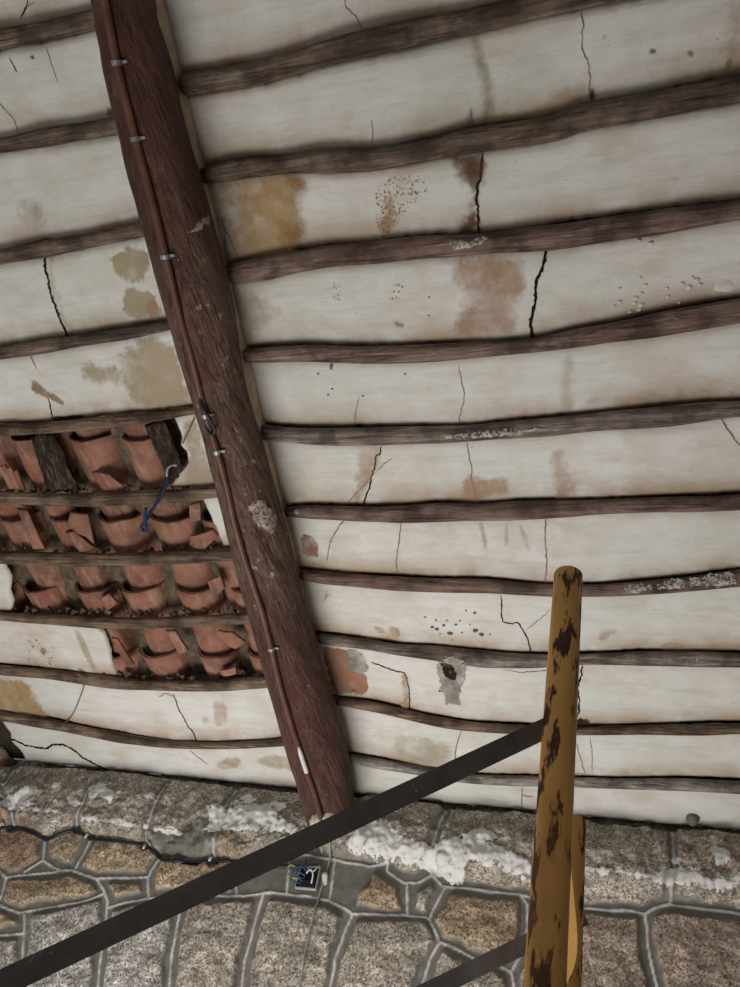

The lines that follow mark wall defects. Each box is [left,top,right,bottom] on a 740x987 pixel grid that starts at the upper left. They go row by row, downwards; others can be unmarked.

water stain [229,175,303,257]
corrosion [373,176,427,238]
crack [475,153,484,233]
crack [43,258,67,336]
water stain [112,247,161,321]
crack [529,251,547,338]
water stain [85,338,188,408]
water stain [0,680,46,717]
spalling [324,646,368,695]
spalling [437,656,466,705]
crack [500,596,547,673]
crack [10,738,110,771]